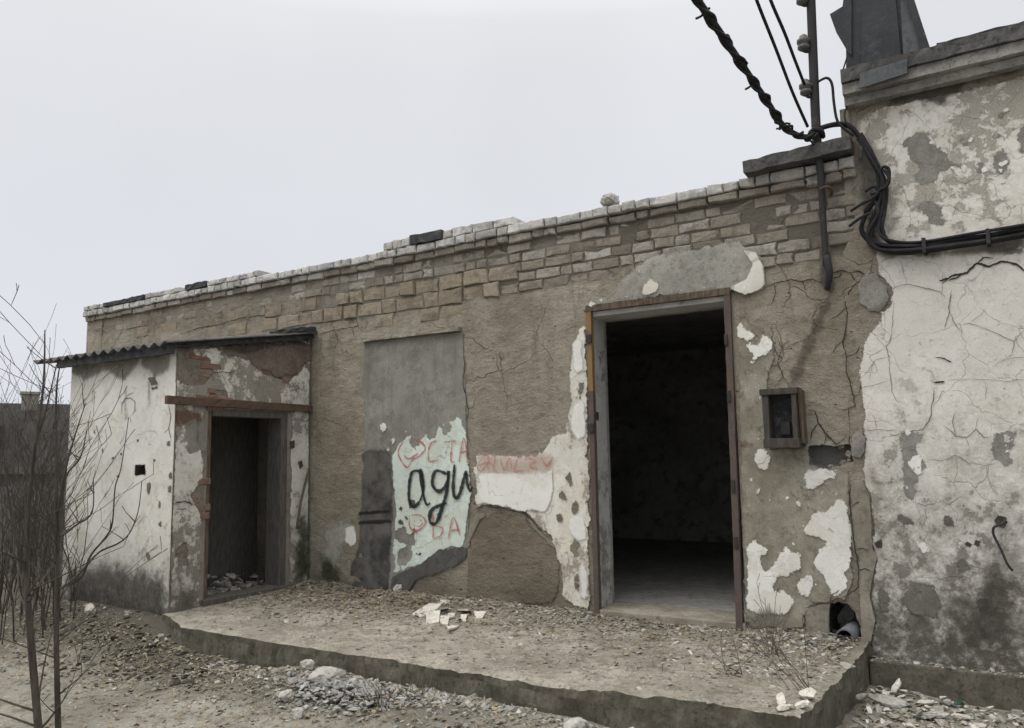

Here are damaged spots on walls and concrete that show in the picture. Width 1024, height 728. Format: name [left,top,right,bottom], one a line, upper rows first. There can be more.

peeling [902,132,973,185]
peeling [976,127,1024,174]
peeling [918,200,951,226]
peeling [588,241,766,307]
crack [462,338,476,445]
crack [764,257,1024,524]
water stain [68,565,163,615]
flaking render [175,340,366,593]
peeling [380,326,591,642]
peeling [736,318,853,678]
crack [806,487,870,609]
water stain [962,576,1014,642]